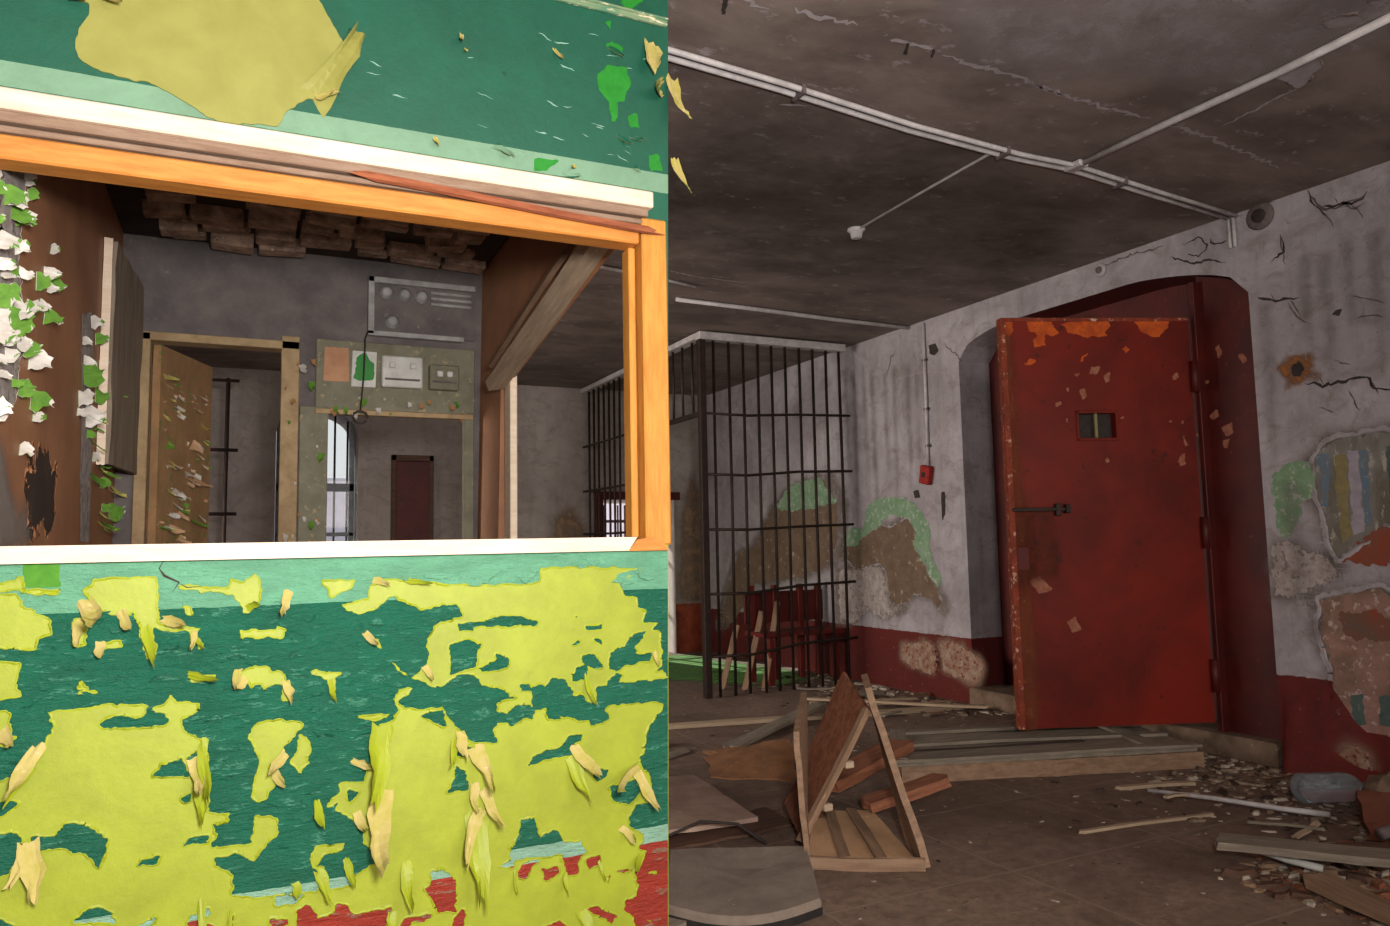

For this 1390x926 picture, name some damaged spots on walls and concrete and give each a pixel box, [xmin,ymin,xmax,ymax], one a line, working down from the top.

peeling [75,0,365,127]
peeling [644,37,693,120]
crack [1098,236,1226,266]
crack [1258,235,1309,324]
crack [1307,189,1367,228]
peeling [0,169,67,544]
peeling [76,311,134,542]
crack [1305,360,1390,413]
peeling [0,373,668,926]
spalling [715,473,948,629]
peeling [900,640,984,686]
spalling [1271,425,1390,771]